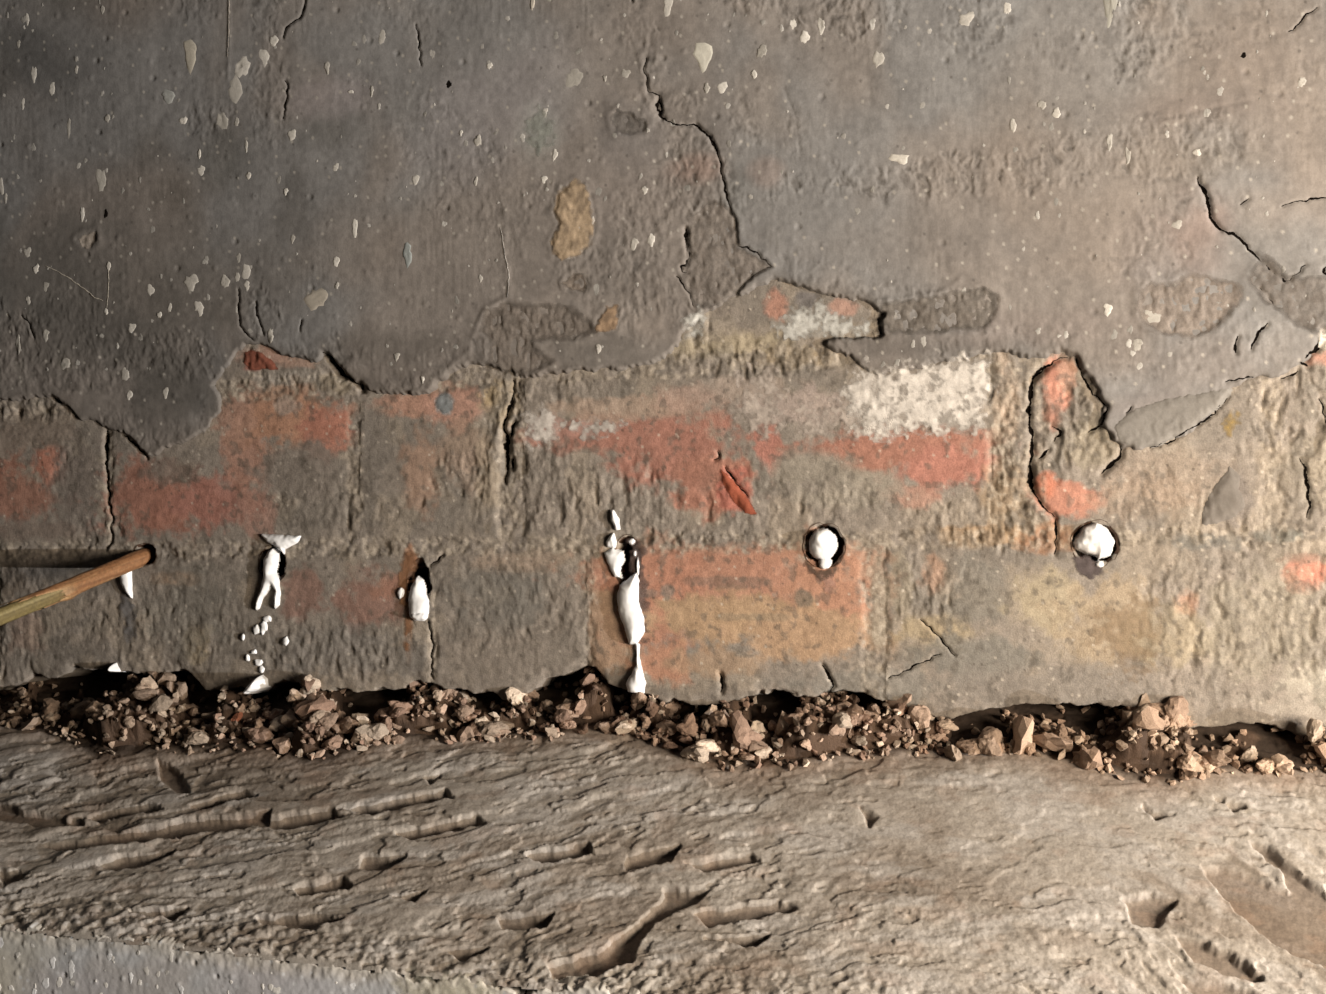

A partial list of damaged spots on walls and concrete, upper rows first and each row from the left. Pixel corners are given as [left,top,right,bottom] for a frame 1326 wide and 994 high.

spalling [551,179,594,261]
crack [643,58,772,306]
spalling [0,200,1326,737]
efflorescence [731,350,994,442]
crack [1026,177,1326,554]